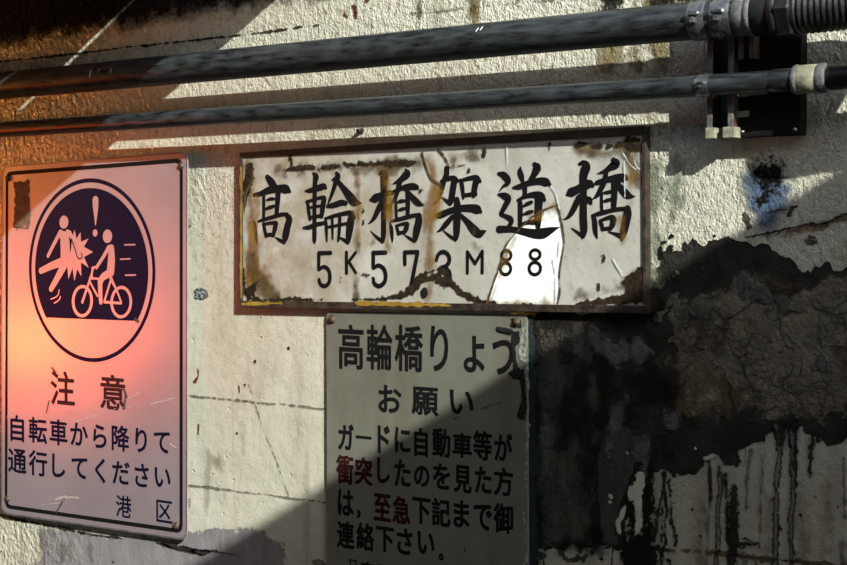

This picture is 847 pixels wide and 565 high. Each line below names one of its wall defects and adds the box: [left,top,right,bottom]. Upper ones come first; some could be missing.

water stain [469,0,480,24]
water stain [596,0,624,11]
water stain [599,46,621,72]
water stain [630,45,642,72]
water stain [650,42,670,67]
water stain [672,178,683,217]
crack [745,209,847,238]
crack [706,284,847,415]
peeling [524,234,847,553]
water stain [527,316,546,565]
water stain [558,355,678,565]
water stain [705,420,815,565]